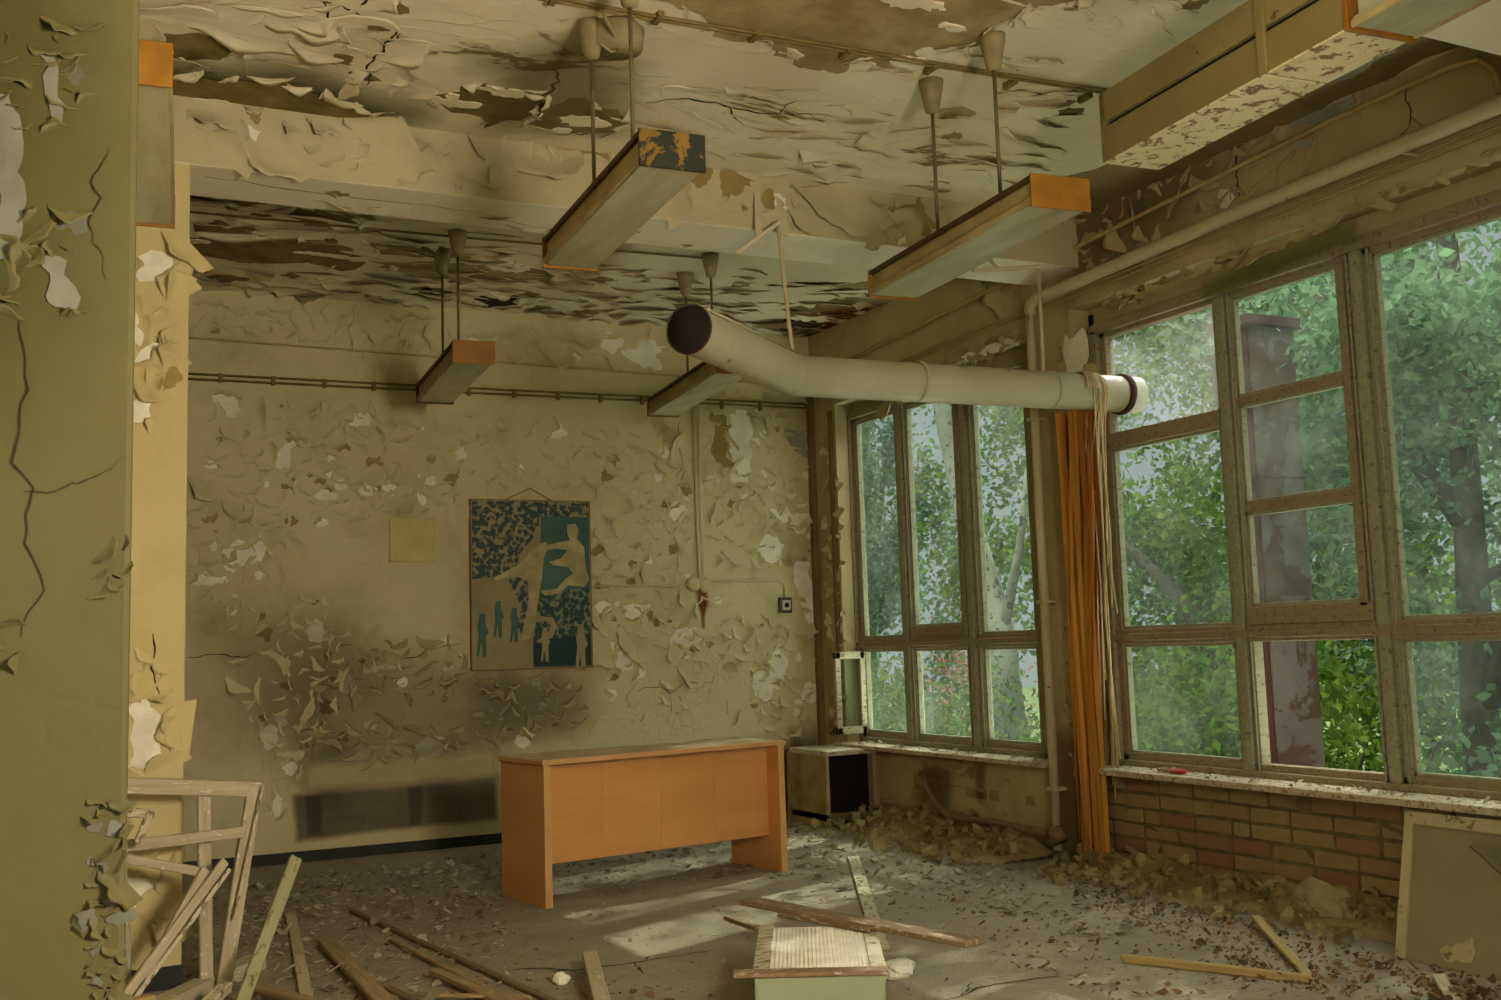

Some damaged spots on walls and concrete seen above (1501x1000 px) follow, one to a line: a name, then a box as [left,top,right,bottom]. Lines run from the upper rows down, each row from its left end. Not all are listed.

peeling [0,13,104,324]
crack [87,150,109,278]
peeling [136,206,572,311]
peeling [149,24,638,191]
peeling [763,298,872,338]
peeling [668,0,1101,77]
peeling [1065,36,1461,220]
crack [10,320,122,635]
peeling [704,406,761,495]
peeling [756,503,815,649]
peeling [128,677,197,778]
peeling [70,799,143,1000]